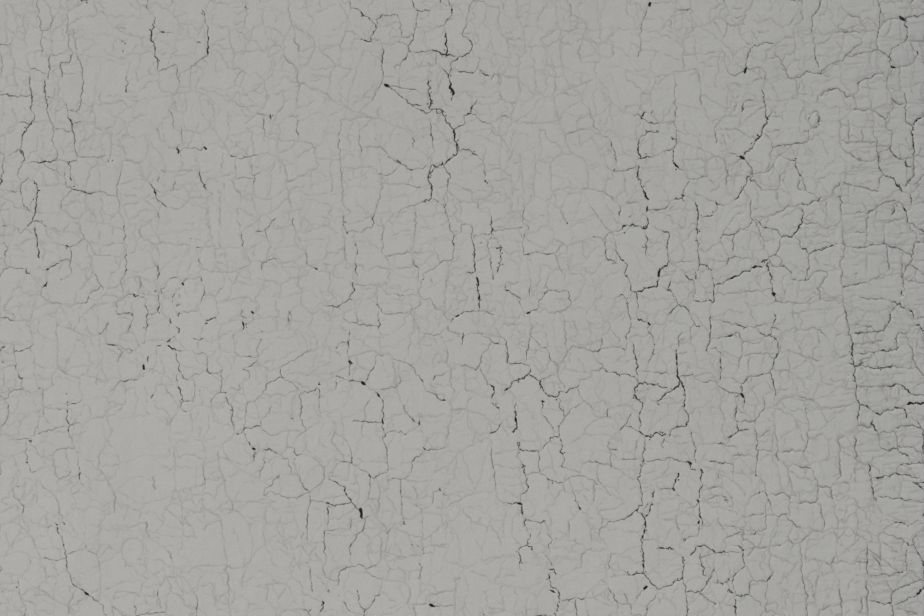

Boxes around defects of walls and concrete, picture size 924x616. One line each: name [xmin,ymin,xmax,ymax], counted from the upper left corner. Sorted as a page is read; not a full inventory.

crack [146,0,209,83]
crack [0,1,122,304]
crack [168,111,207,189]
crack [230,115,273,186]
crack [322,0,924,616]
crack [0,343,84,514]
crack [99,224,380,615]
crack [45,522,164,616]